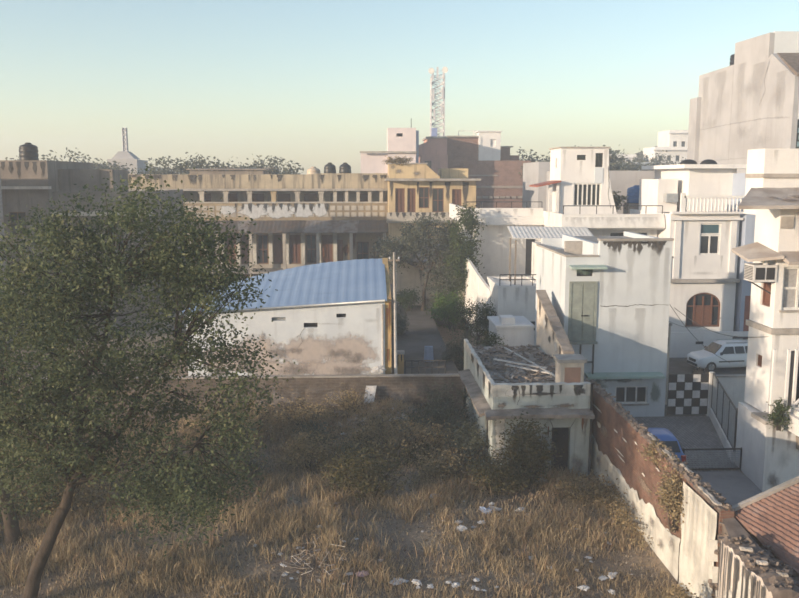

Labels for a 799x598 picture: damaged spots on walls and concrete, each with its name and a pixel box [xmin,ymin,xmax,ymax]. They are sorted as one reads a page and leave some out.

peeling [220,203,327,219]
leakage [603,241,667,254]
leakage [511,385,562,400]
leakage [717,543,764,598]